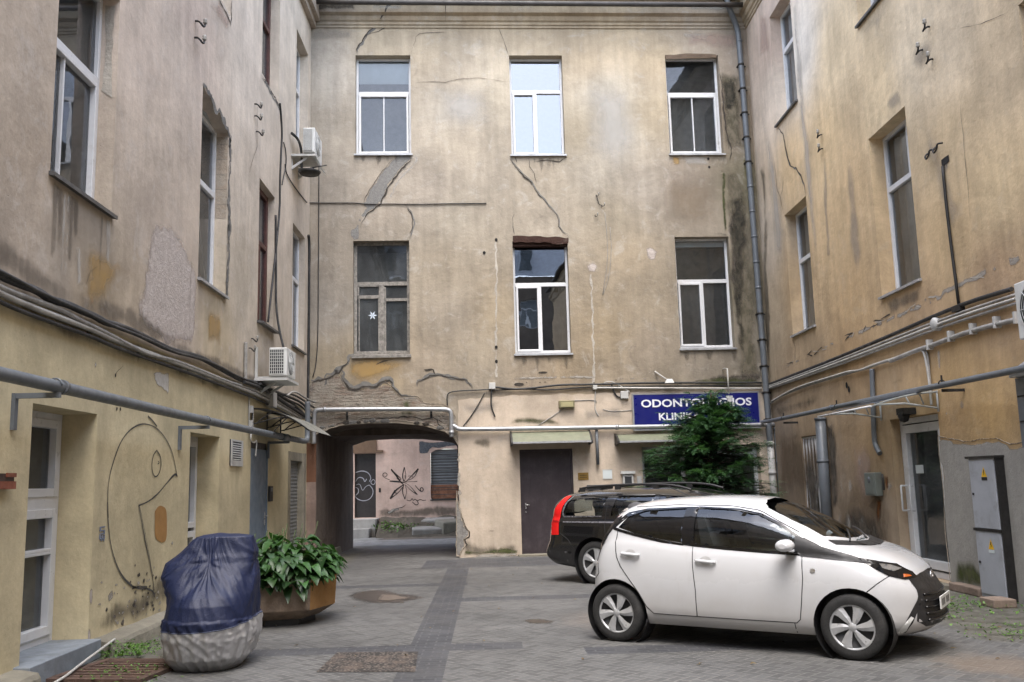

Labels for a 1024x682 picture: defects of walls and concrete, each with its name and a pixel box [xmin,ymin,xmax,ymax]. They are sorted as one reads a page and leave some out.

crack [356,5,391,53]
leakage [722,76,741,146]
crack [407,208,415,236]
crack [511,157,570,236]
crack [773,128,805,205]
spalling [139,226,196,344]
leakage [701,176,770,387]
spalling [845,268,995,340]
crack [311,353,473,429]
spalling [309,361,470,556]